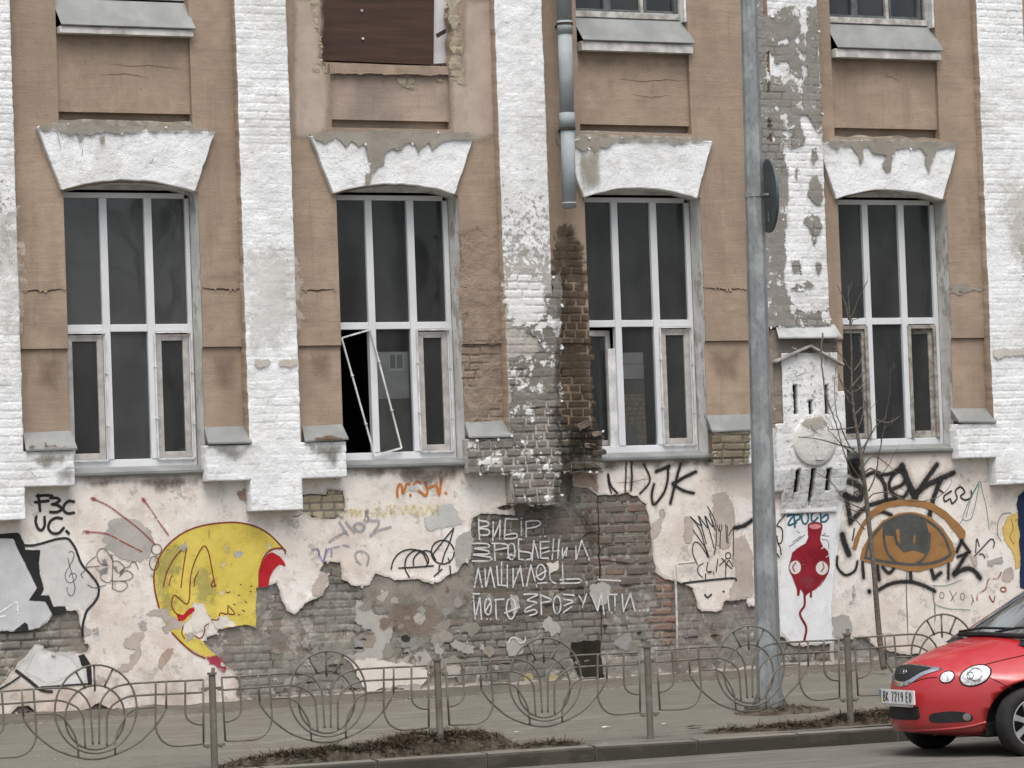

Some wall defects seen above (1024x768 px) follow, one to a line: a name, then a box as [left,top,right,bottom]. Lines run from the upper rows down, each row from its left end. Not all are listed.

flaking render [436,0,467,87]
peeling [312,129,474,186]
peeling [757,0,959,329]
flaking render [93,223,756,700]
flaking render [0,610,100,686]